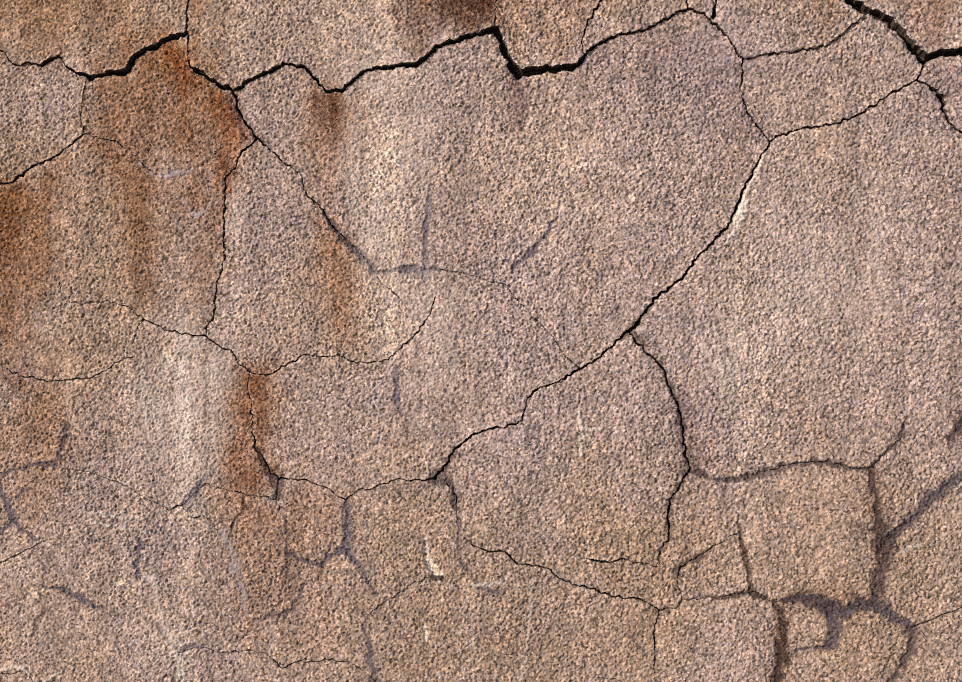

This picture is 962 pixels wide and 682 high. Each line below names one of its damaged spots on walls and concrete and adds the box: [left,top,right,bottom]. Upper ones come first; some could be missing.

crack [0,0,962,420]
crack [217,142,771,565]
crack [764,422,906,472]
crack [61,467,139,495]
crack [146,483,218,530]
crack [0,539,48,564]
crack [370,577,429,614]
crack [461,533,780,673]
crack [912,607,961,628]
crack [178,647,376,682]